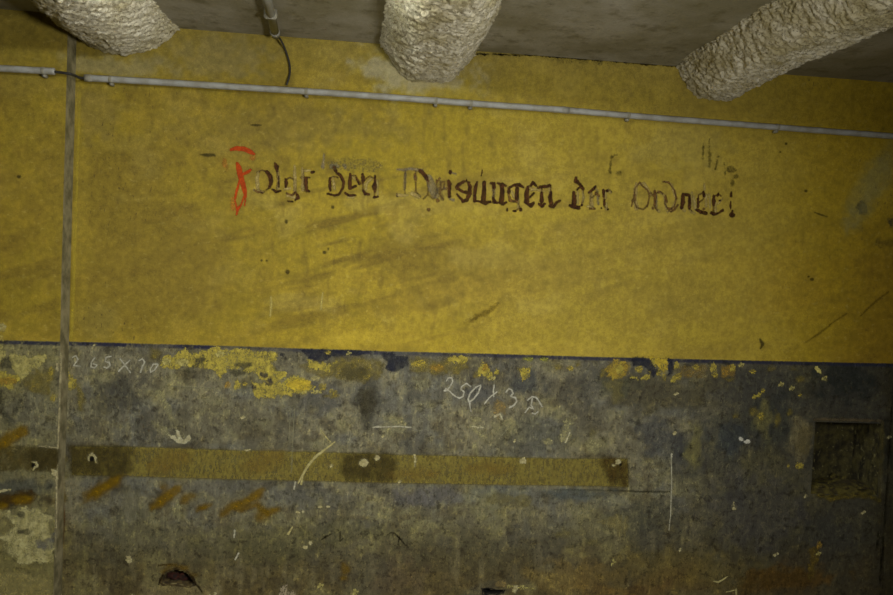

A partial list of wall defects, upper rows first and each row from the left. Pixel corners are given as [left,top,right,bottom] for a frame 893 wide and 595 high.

peeling [0,323,86,449]
peeling [152,345,500,399]
peeling [600,356,756,403]
spalling [158,564,202,595]